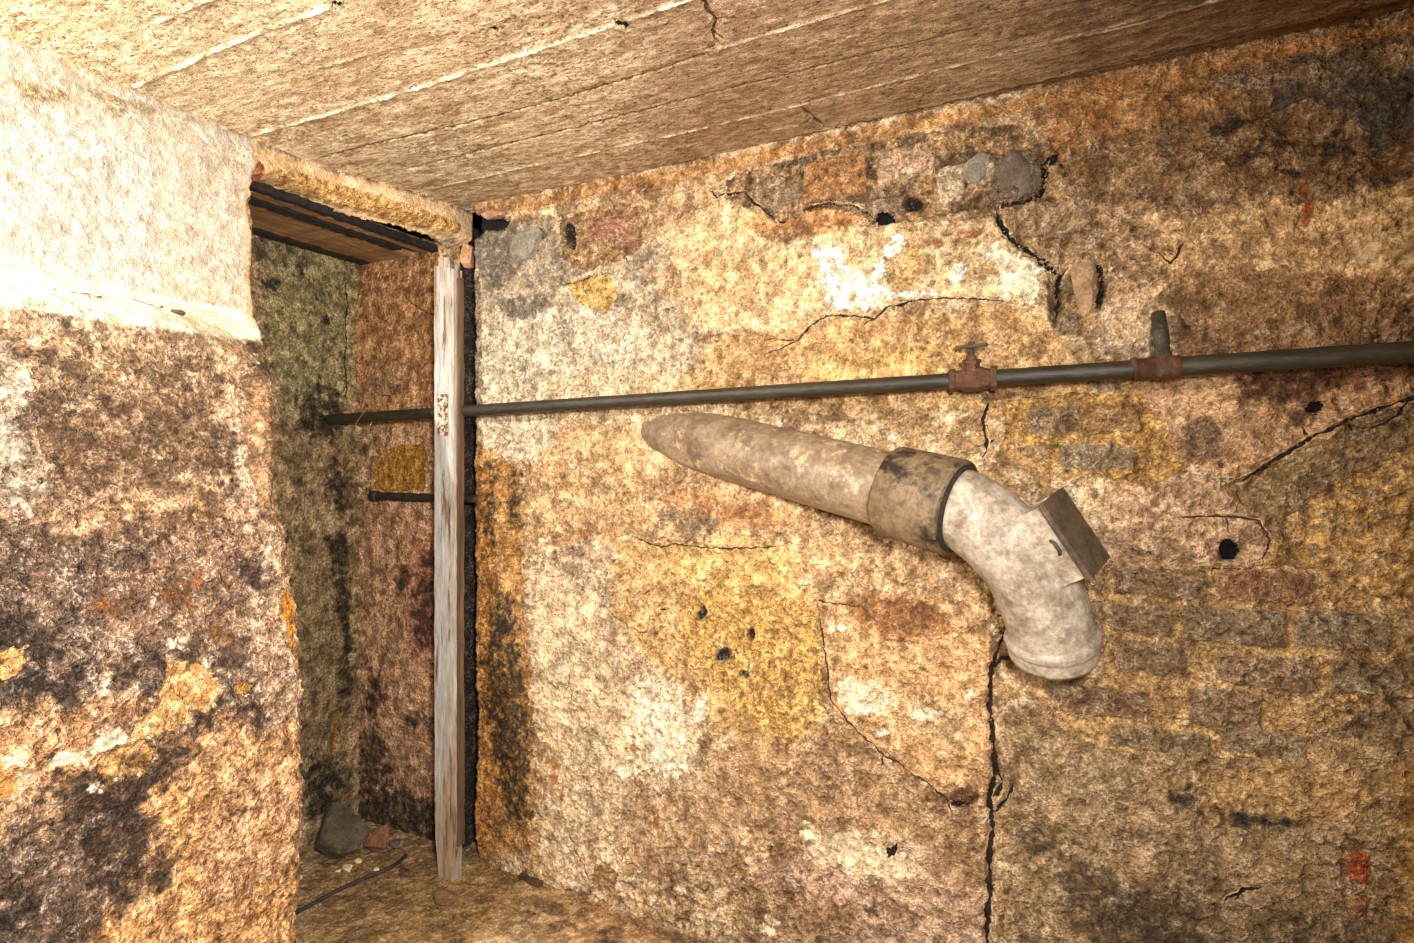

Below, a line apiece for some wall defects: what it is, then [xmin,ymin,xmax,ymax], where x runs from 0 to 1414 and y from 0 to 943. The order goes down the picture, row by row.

crack [323,0,1000,167]
spalling [724,124,1113,337]
crack [995,154,1104,321]
leakage [1327,172,1414,275]
crack [764,295,1001,354]
leakage [0,359,218,519]
crack [1174,393,1414,570]
leakage [0,596,89,706]
leakage [1,727,203,903]
leakage [109,636,199,688]
leakage [193,695,261,731]
crack [816,599,1014,943]